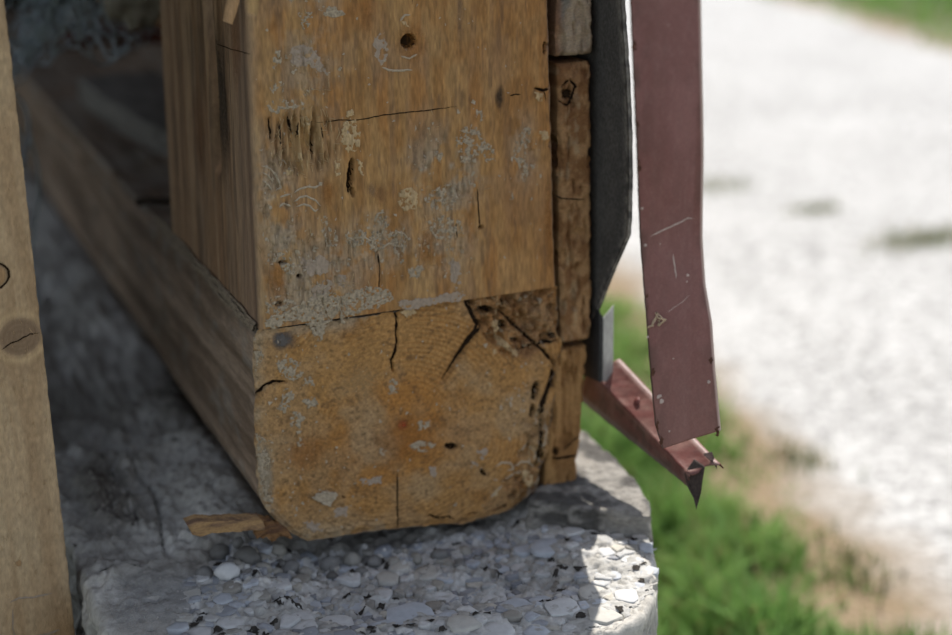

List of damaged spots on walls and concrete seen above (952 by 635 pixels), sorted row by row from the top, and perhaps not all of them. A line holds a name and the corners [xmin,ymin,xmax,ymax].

crack [268,106,456,145]
crack [390,310,398,369]
crack [442,299,579,466]
crack [393,472,401,528]